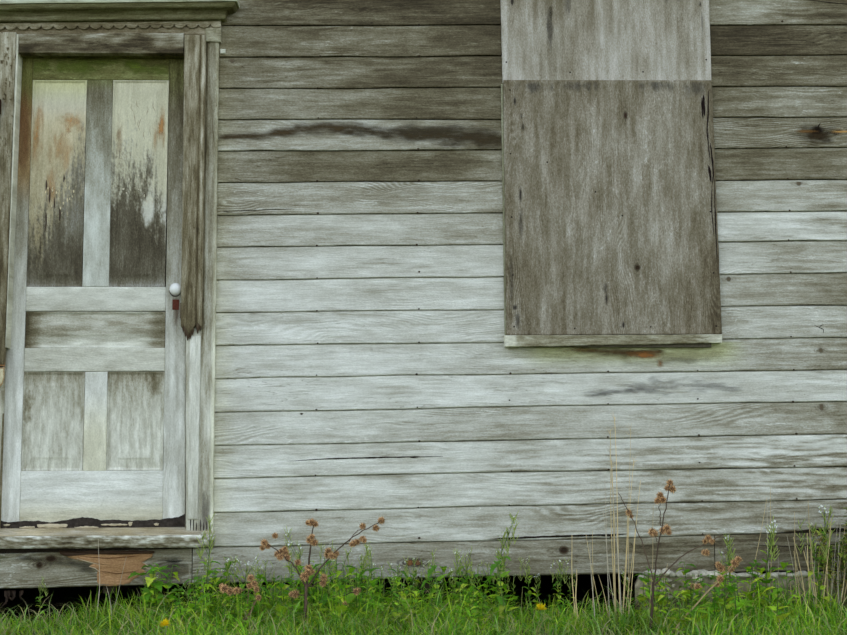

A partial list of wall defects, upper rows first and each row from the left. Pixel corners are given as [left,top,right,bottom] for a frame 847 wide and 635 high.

leakage [221,123,502,146]
peeling [45,176,74,230]
corrosion [574,348,662,366]
crack [296,454,441,462]